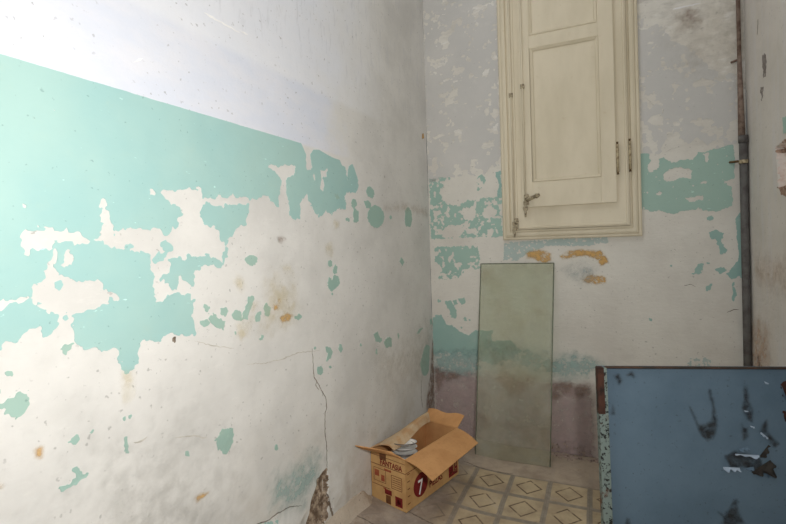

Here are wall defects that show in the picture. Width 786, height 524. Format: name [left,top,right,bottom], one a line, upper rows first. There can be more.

peeling [0,54,392,375]
peeling [429,171,608,279]
rust [527,250,550,262]
rust [561,250,608,265]
peeling [641,145,735,221]
peeling [692,213,742,301]
peeling [0,390,30,419]
peeling [58,466,89,492]
peeling [214,428,234,454]
crack [248,350,327,460]
spalling [306,468,329,524]
water stain [427,344,595,457]